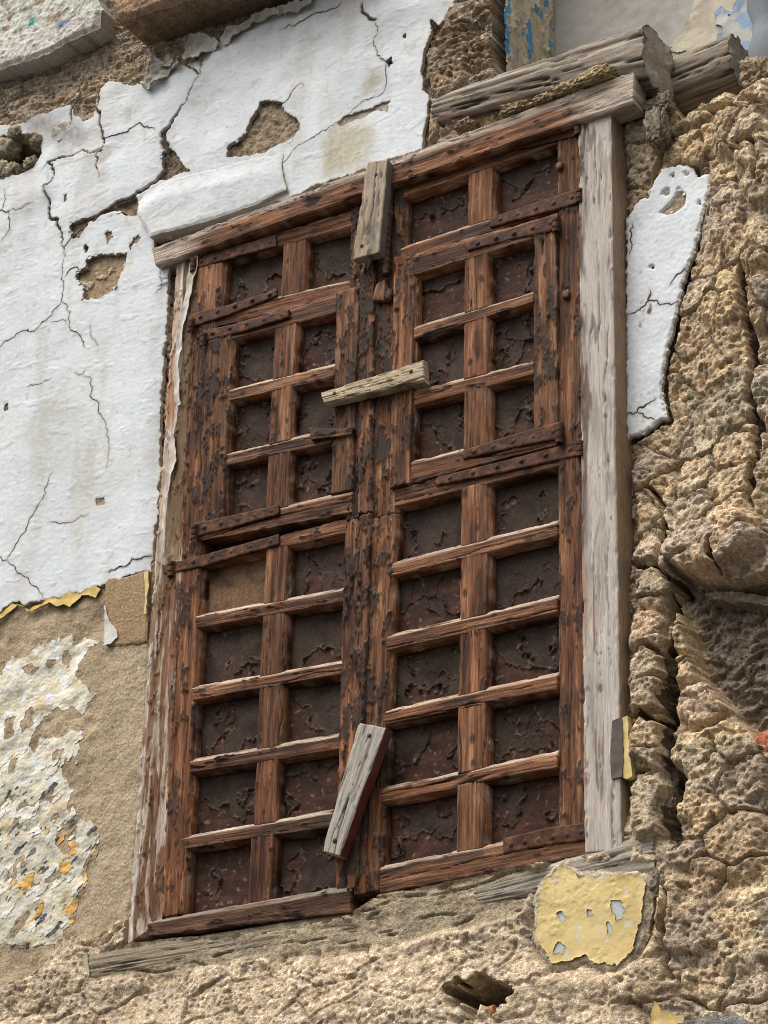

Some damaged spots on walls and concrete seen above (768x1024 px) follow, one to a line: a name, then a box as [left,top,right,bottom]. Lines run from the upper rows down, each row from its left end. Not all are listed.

peeling [670,0,752,53]
flaking render [229,102,300,157]
crack [282,4,387,167]
flaking render [662,188,686,215]
crack [0,65,203,443]
flaking render [76,236,141,300]
crack [1,473,83,597]
peeling [0,586,118,949]
peeling [535,864,646,966]